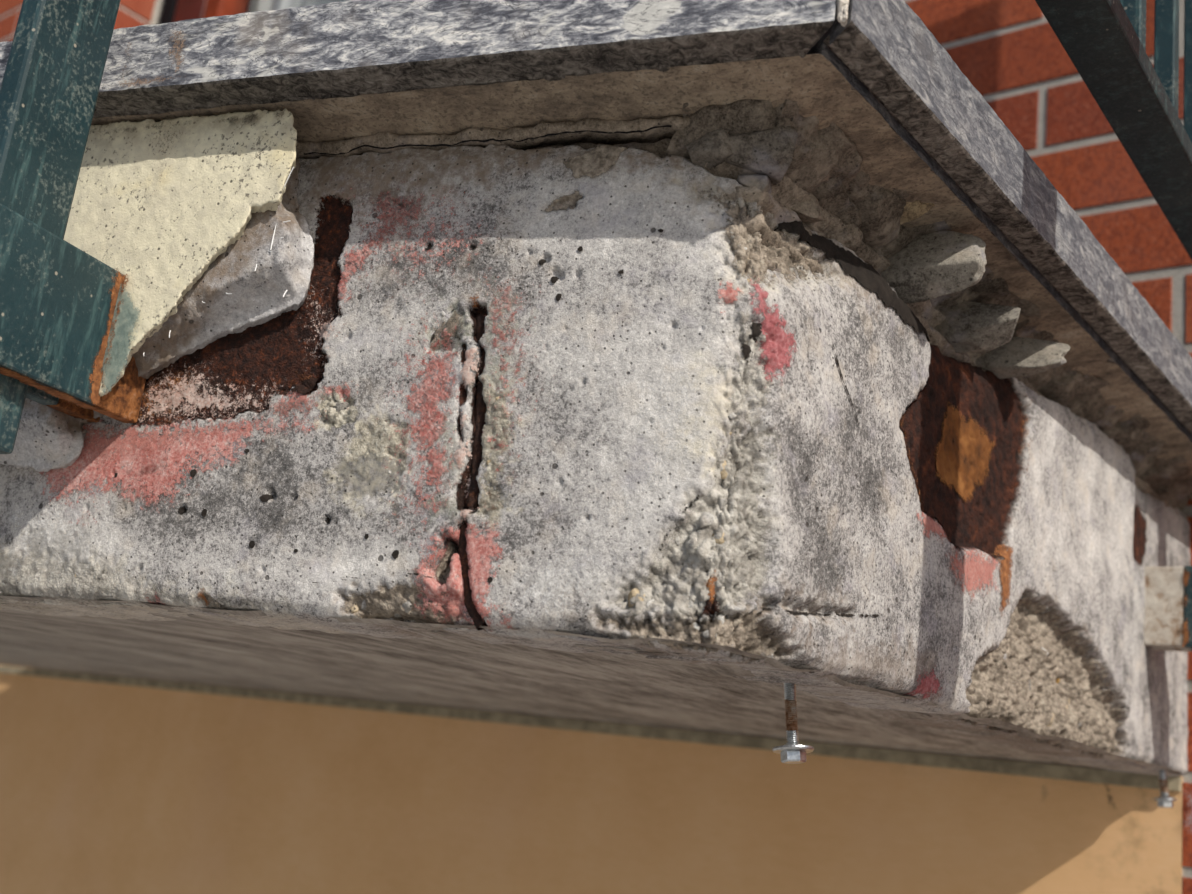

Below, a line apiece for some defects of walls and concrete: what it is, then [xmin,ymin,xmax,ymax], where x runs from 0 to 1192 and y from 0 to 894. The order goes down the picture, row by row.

crack [304,125,671,155]
rust [135,195,353,437]
crack [773,220,931,342]
crack [430,297,488,631]
rust [899,344,1032,613]